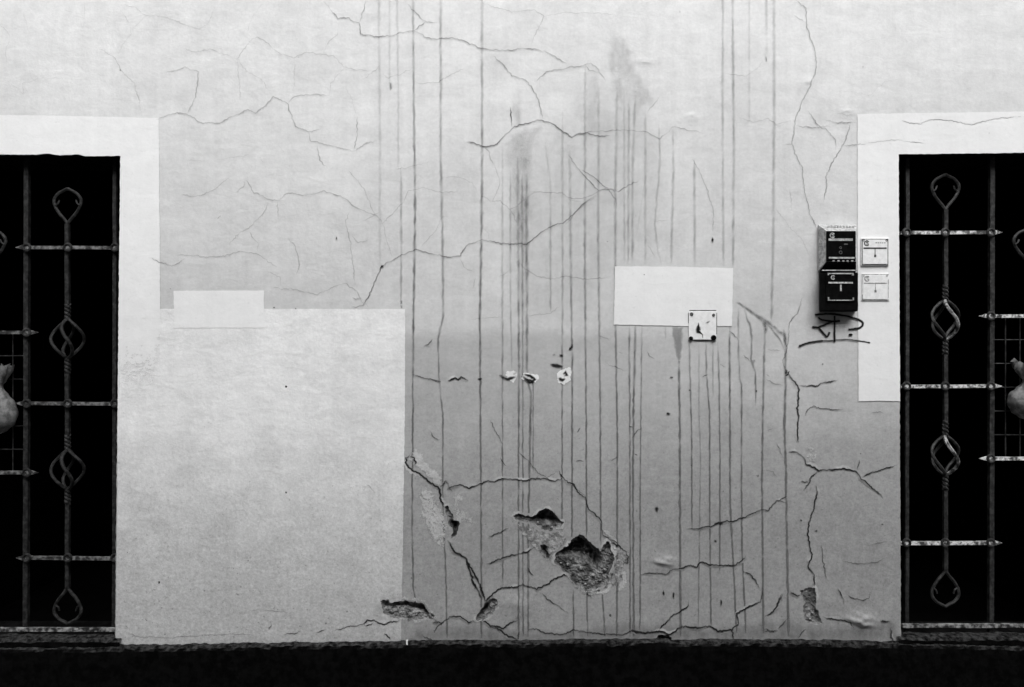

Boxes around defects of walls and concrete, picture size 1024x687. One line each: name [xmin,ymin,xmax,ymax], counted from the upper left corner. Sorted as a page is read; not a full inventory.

crack [418,23,611,147]
crack [269,618,399,639]
flaking render [372,595,438,623]
peeling [409,449,474,547]
leakage [518,375,534,633]
flaking render [511,506,629,595]
leakage [561,387,587,537]
leakage [602,338,641,634]
crack [404,372,894,640]
leakage [678,371,693,635]
leakage [698,338,746,632]
flaking render [800,585,823,625]